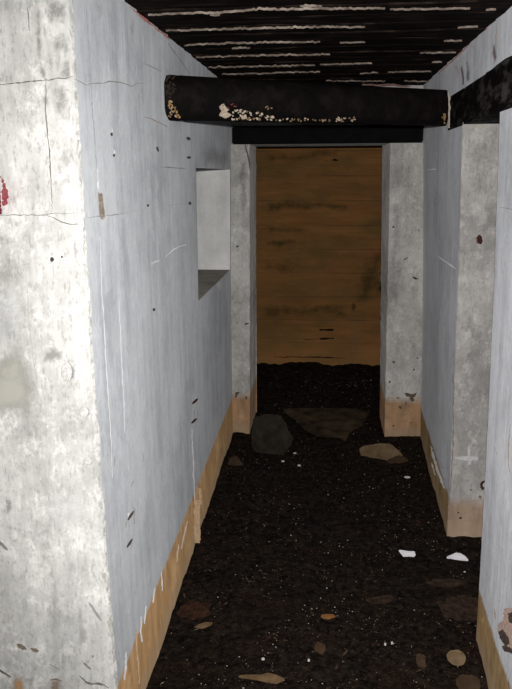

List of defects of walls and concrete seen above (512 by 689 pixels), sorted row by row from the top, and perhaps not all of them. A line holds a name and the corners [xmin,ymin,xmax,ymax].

crack [0,6,185,225]
peeling [219,103,356,122]
spalling [497,608,512,653]